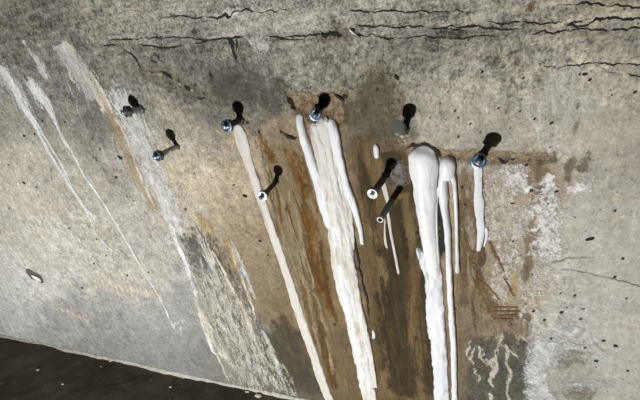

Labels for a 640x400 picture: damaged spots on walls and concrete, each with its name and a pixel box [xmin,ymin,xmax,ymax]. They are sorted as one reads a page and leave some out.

crack [104,2,640,77]
water stain [0,39,334,400]
rust [258,133,350,391]
water stain [296,72,615,400]
rust [454,163,533,383]
crack [549,257,640,287]